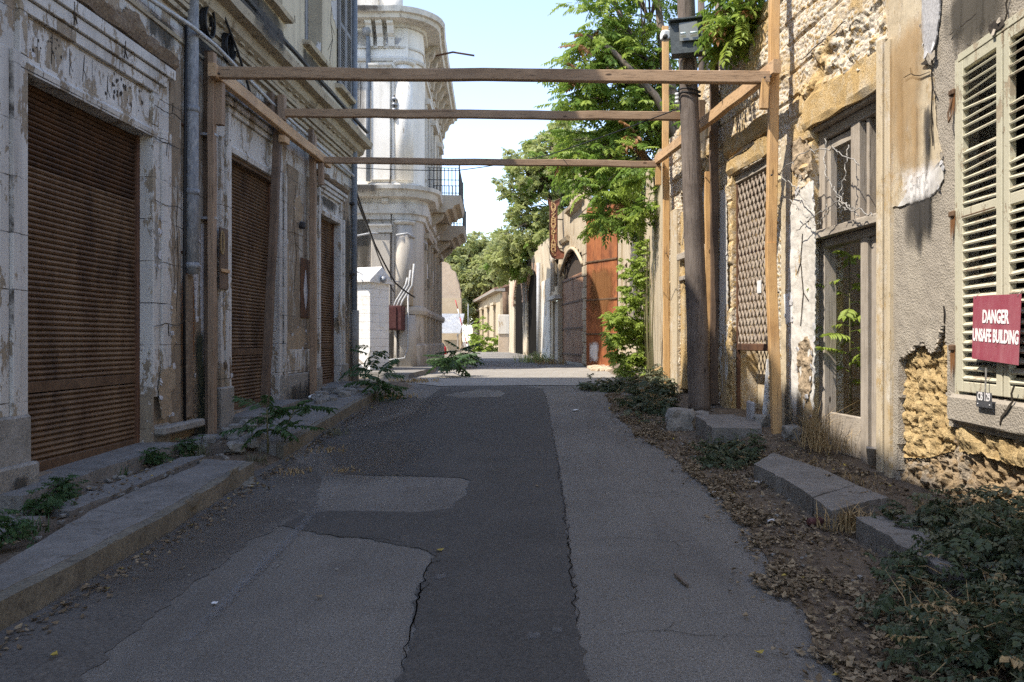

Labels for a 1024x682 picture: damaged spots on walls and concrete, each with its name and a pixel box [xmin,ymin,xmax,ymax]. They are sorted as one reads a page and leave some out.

peeling [105,72,143,111]
peeling [796,0,945,207]
peeling [780,137,816,437]
flaking render [900,326,1024,524]
crack [401,558,441,670]